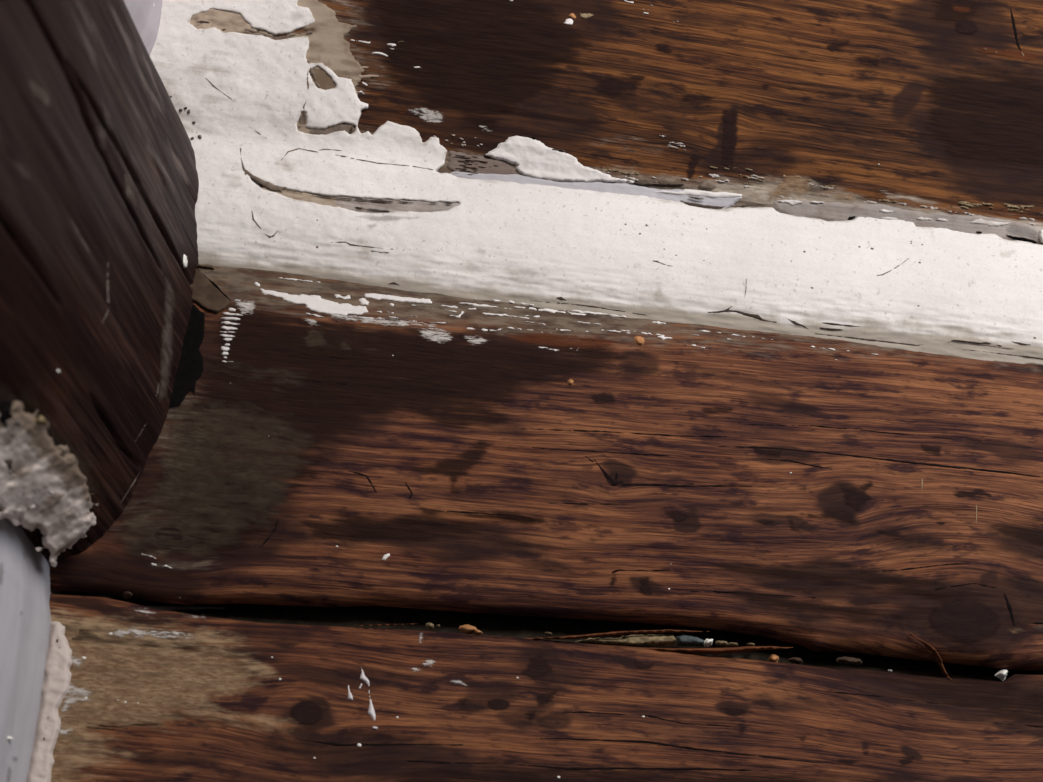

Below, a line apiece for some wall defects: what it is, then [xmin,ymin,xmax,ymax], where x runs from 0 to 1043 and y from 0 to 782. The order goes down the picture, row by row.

peeling [190,0,404,96]
damp [374,0,589,127]
peeling [410,108,442,122]
peeling [240,148,459,213]
peeling [434,126,765,209]
damp [710,176,864,206]
peeling [774,175,1043,244]
damp [883,193,943,213]
damp [160,280,174,397]
peeling [254,277,671,339]
damp [160,301,618,555]
crack [87,593,225,610]